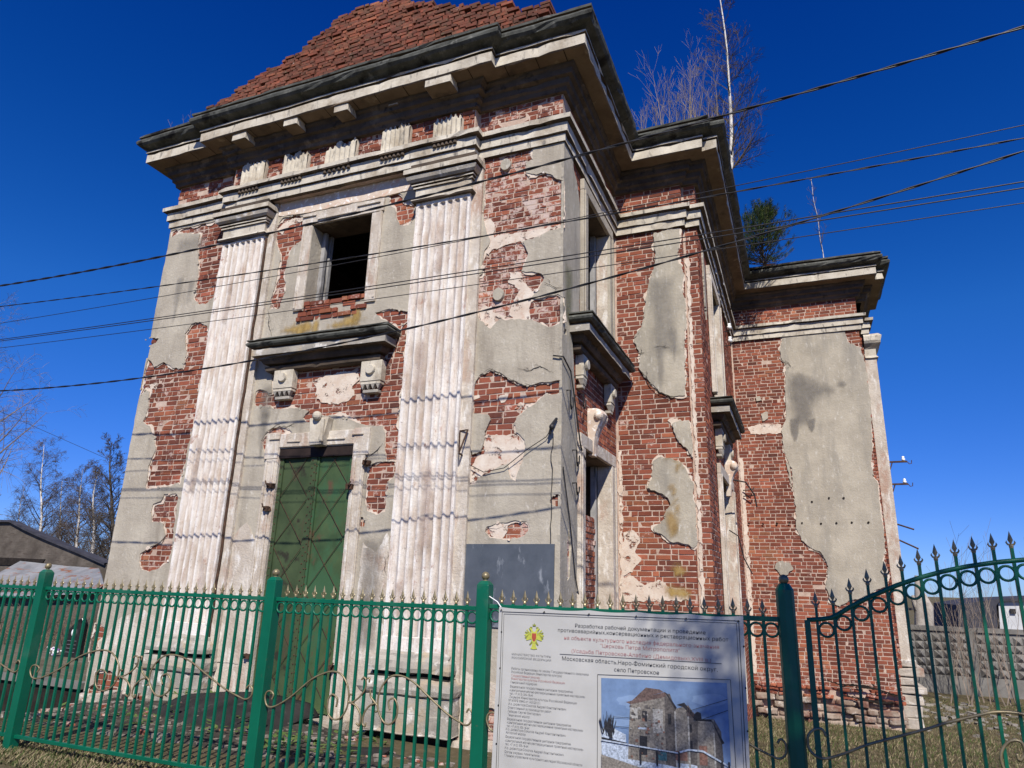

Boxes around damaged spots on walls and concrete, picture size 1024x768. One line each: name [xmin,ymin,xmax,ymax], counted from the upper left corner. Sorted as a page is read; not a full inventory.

spalling [171,222,223,304]
spalling [270,215,303,309]
spalling [478,149,567,329]
spalling [140,323,208,572]
spalling [255,307,408,528]
spalling [486,520,530,541]
spalling [470,370,559,485]
peeling [617,228,707,612]
peeling [739,458,757,674]
leakage [791,377,821,438]
peeling [748,331,890,607]